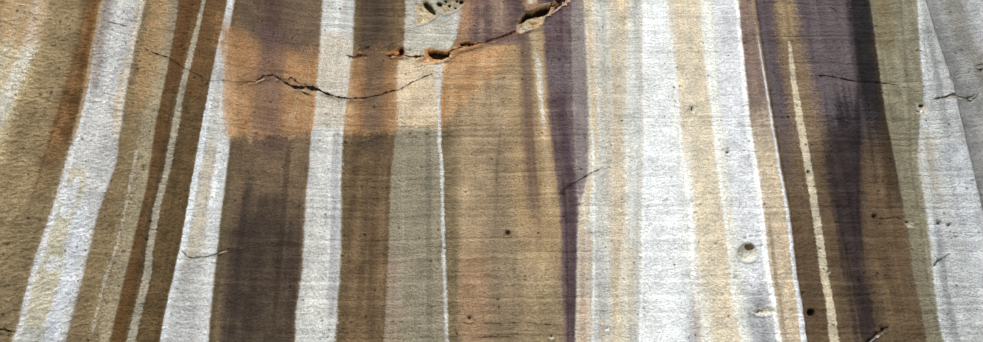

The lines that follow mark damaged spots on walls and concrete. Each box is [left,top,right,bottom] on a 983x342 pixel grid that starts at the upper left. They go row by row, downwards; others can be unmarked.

water stain [0,45,46,177]
water stain [9,0,557,342]
crack [144,0,571,101]
spalling [386,39,480,67]
spalling [413,0,465,26]
water stain [442,0,925,342]
water stain [900,0,983,342]